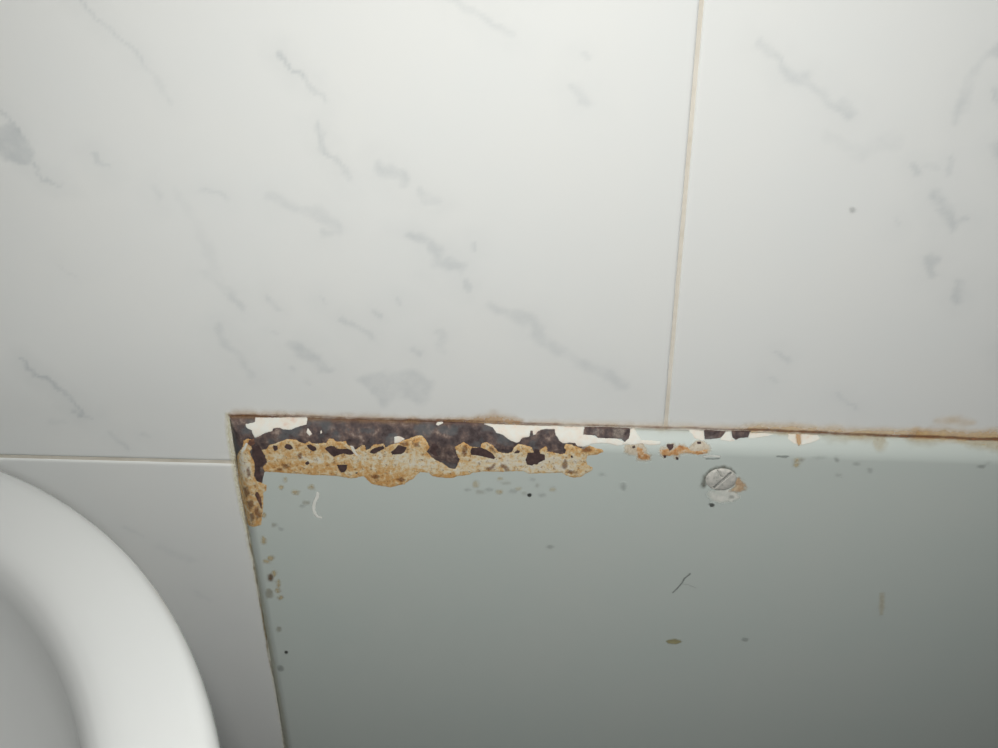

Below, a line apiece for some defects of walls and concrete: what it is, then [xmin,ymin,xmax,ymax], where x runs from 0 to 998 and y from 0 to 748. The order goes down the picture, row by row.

peeling [584,427,661,445]
peeling [689,430,773,441]
rust [746,427,998,440]
rust [229,414,709,552]